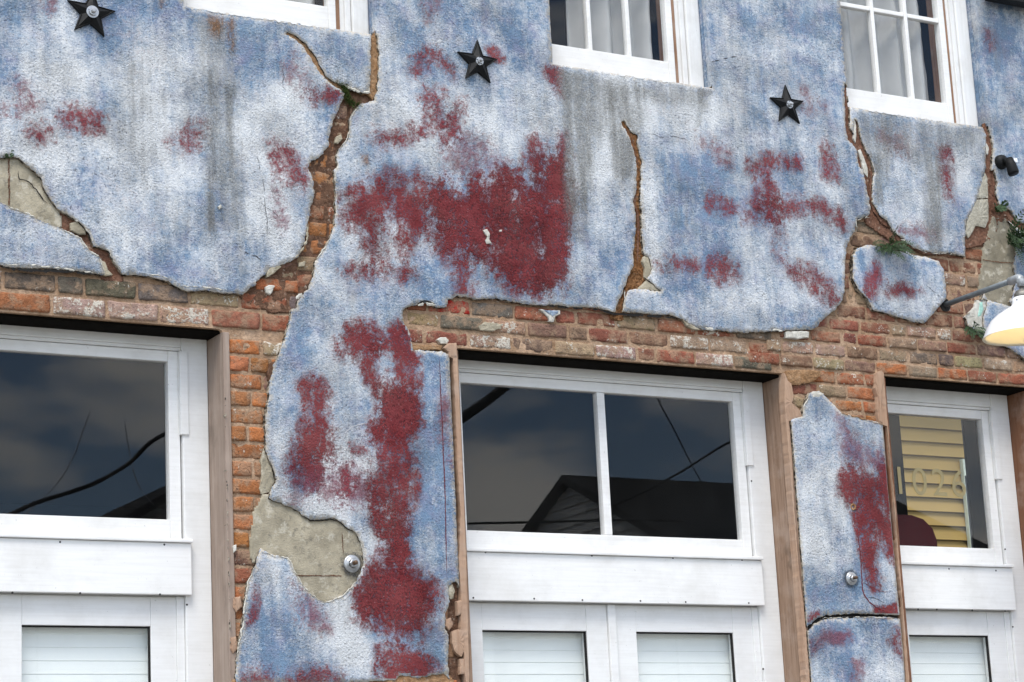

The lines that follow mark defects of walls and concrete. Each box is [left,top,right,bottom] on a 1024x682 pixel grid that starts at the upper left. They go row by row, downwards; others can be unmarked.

peeling [283,50,342,108]
spalling [0,157,62,228]
peeling [266,138,310,229]
peeling [337,84,575,301]
crack [610,121,687,321]
peeling [936,144,954,199]
spalling [0,216,1024,682]
crack [808,529,898,629]